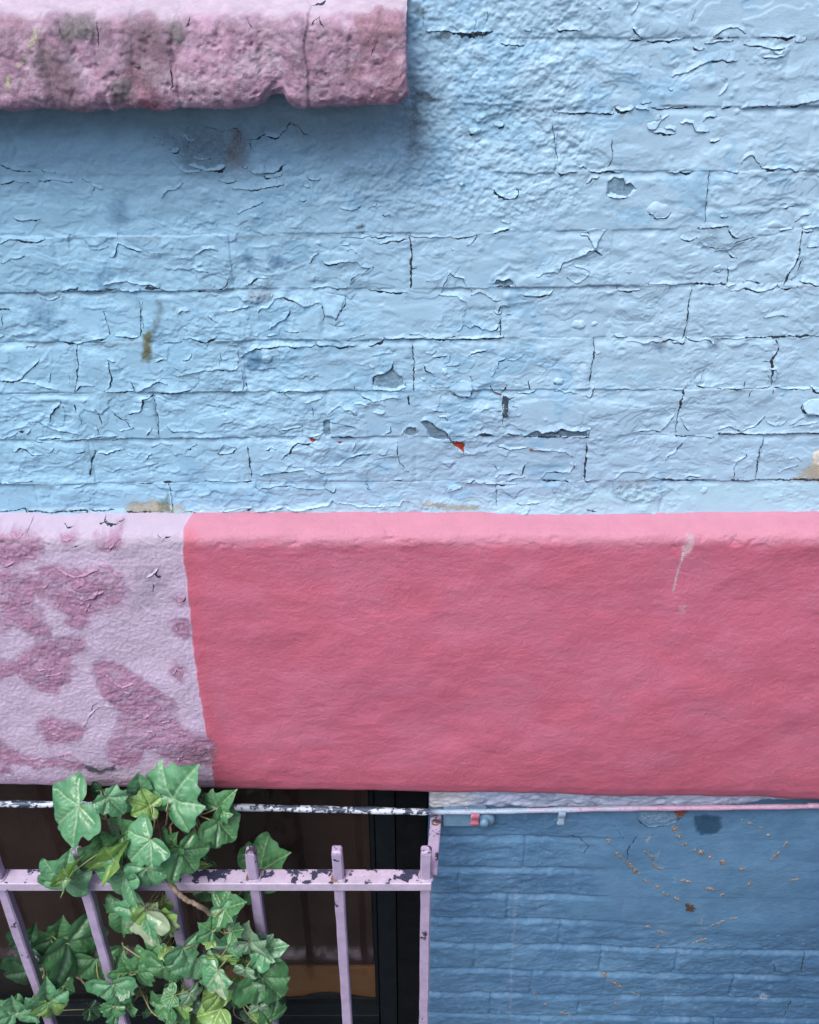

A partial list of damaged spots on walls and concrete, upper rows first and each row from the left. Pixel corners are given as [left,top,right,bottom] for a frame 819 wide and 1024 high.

peeling [553,78,819,144]
peeling [558,163,636,199]
peeling [680,214,757,273]
crack [784,231,805,284]
peeling [40,228,606,513]
crack [589,337,601,382]
crack [764,339,781,383]
peeling [0,359,126,456]
crack [74,398,159,476]
crack [583,444,591,483]
crack [632,390,690,461]
peeling [685,370,819,439]